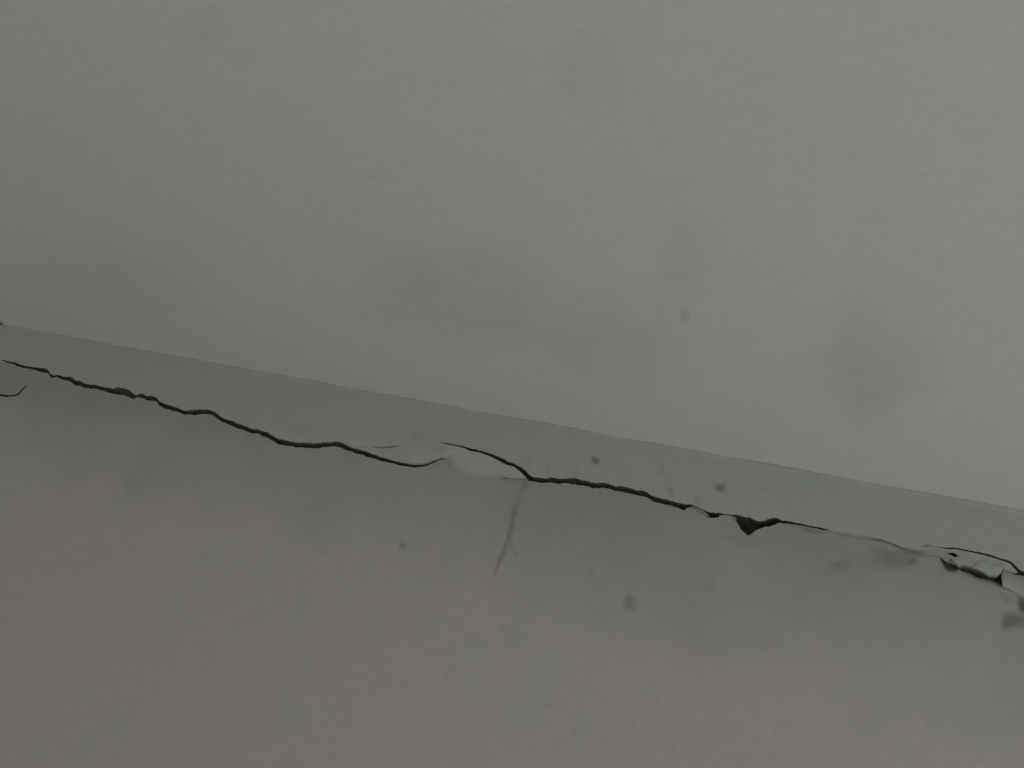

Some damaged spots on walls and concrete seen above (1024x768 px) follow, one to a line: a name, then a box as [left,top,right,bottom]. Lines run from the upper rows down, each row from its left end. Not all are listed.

crack [0,360,737,521]
crack [765,518,828,530]
crack [872,538,907,550]
flaking render [939,549,1024,595]
crack [940,547,1024,576]